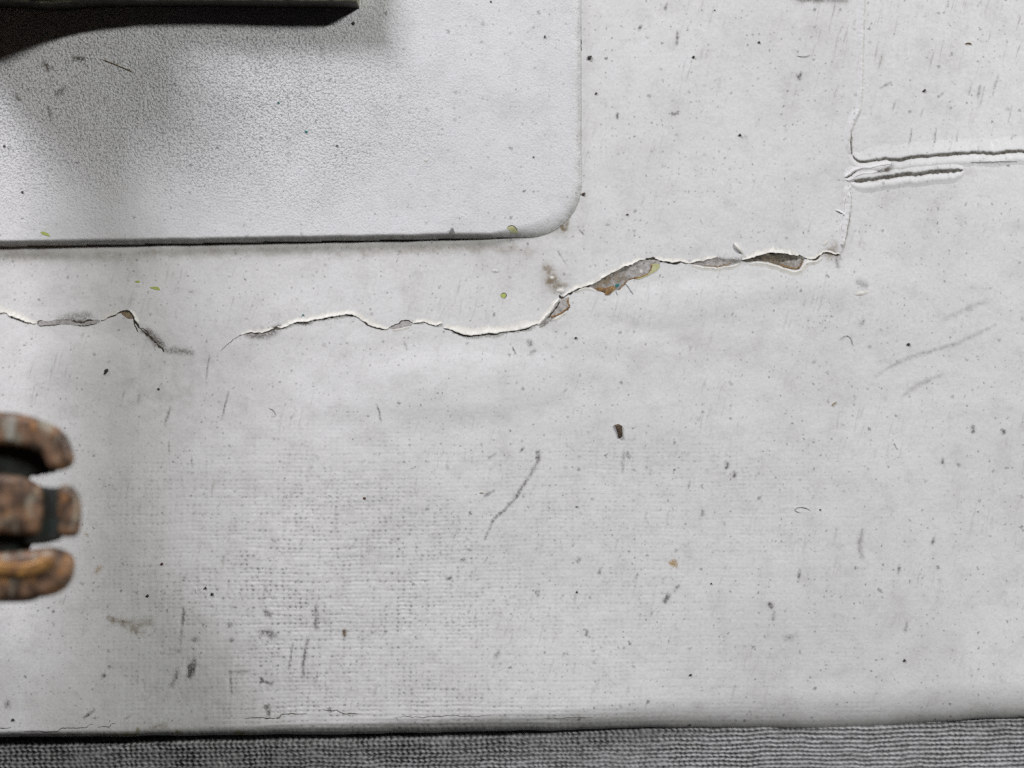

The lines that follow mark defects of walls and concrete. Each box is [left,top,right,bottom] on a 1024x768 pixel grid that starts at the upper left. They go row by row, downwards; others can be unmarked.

crack [559,246,840,299]
peeling [691,243,823,276]
crack [0,305,37,324]
crack [101,310,185,352]
crack [221,309,541,351]
peeling [537,260,660,328]